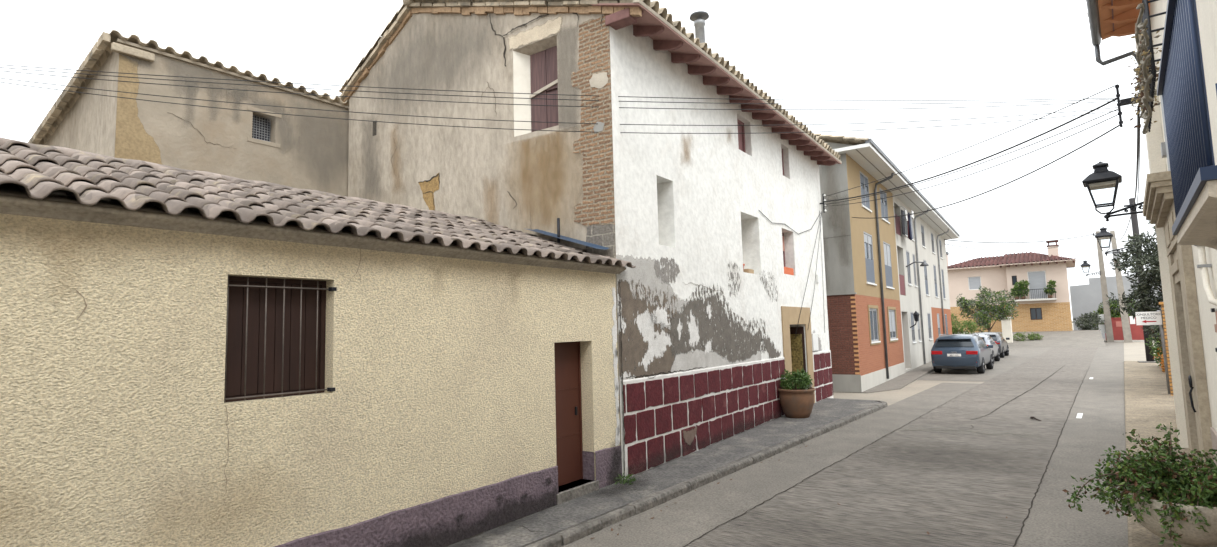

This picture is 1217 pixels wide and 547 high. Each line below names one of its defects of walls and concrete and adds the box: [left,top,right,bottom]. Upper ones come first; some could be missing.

crack [481,13,603,115]
spalling [418,173,440,211]
peeling [612,257,781,446]